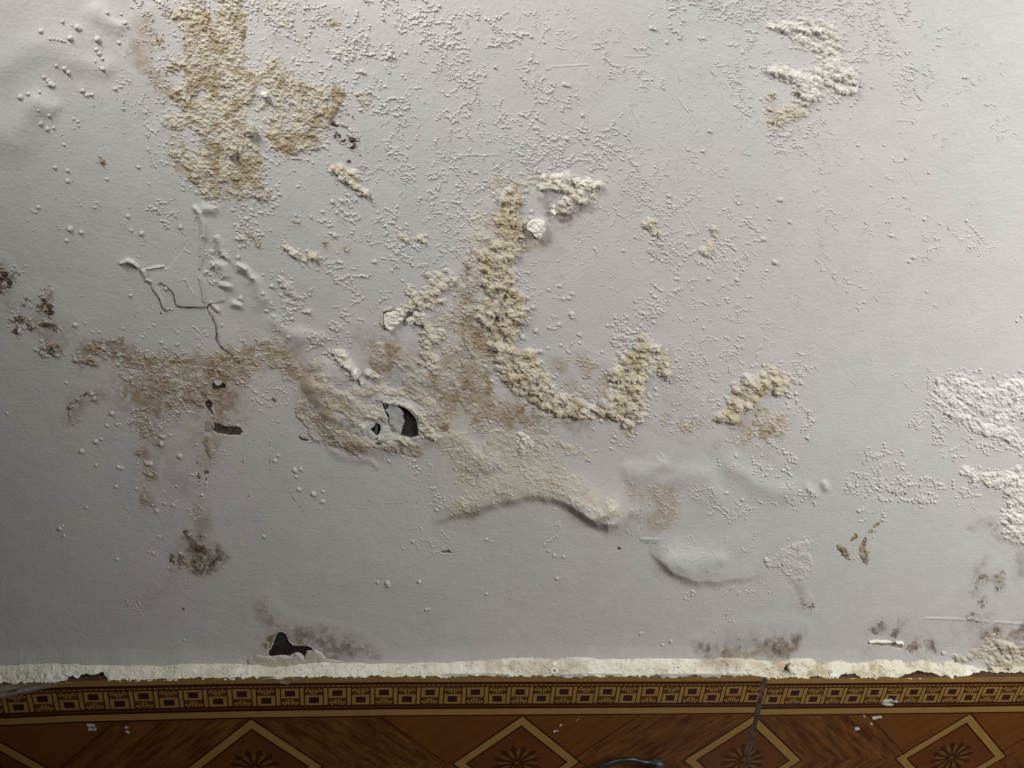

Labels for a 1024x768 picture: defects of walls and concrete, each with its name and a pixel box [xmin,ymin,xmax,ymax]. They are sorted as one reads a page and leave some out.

flaking render [136,0,374,226]
crack [151,283,237,359]
damp [89,220,804,542]
flaking render [113,163,804,527]
peeling [0,631,1024,678]